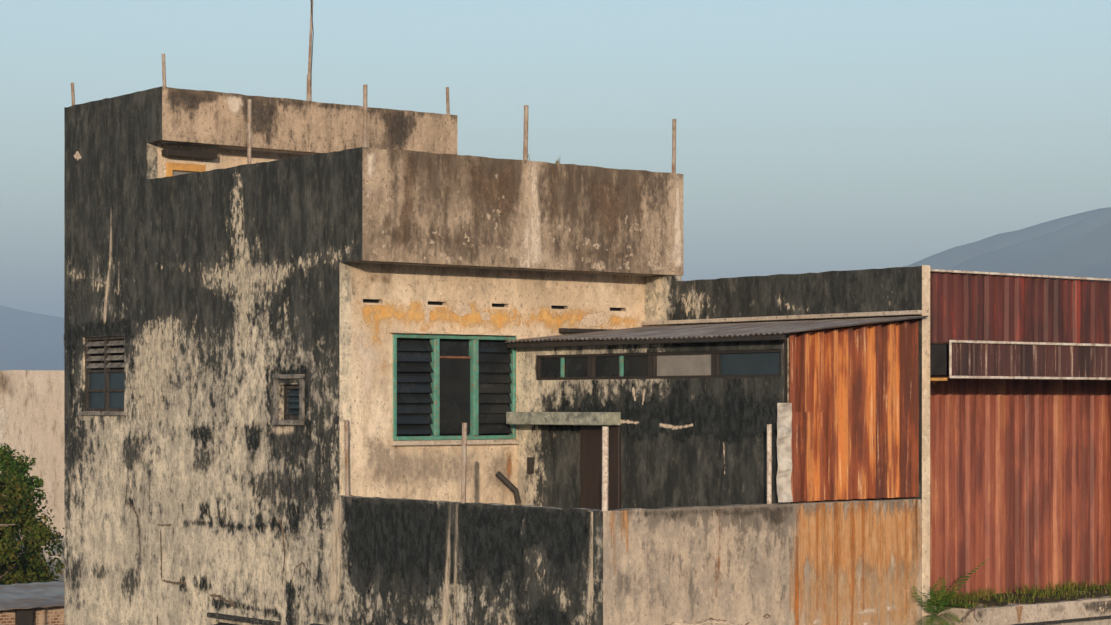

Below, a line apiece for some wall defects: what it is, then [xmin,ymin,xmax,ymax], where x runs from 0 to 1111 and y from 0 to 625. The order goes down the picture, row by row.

leakage [169,93,210,111]
leakage [246,101,294,139]
leakage [367,111,415,243]
leakage [472,162,541,267]
leakage [673,183,682,267]
leakage [778,273,823,320]
leakage [212,580,299,625]
leakage [318,499,593,625]
crack [666,614,771,625]
rust [790,499,921,625]